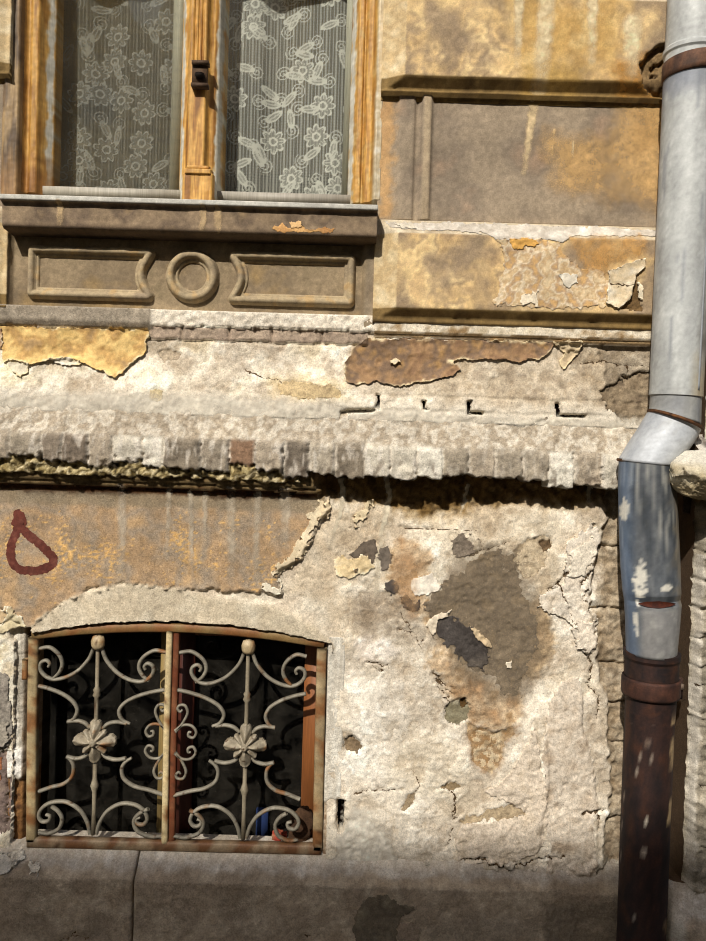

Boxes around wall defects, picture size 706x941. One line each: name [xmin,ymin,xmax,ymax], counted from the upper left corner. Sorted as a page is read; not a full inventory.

leakage [515,0,523,44]
leakage [537,0,553,62]
leakage [588,0,598,39]
leakage [625,16,640,56]
leakage [524,100,537,159]
peeling [384,221,656,312]
peeling [0,325,181,378]
peeling [277,338,583,400]
peeling [261,496,332,597]
flaking render [334,522,601,698]
peeling [541,678,600,877]
spalling [337,799,345,827]